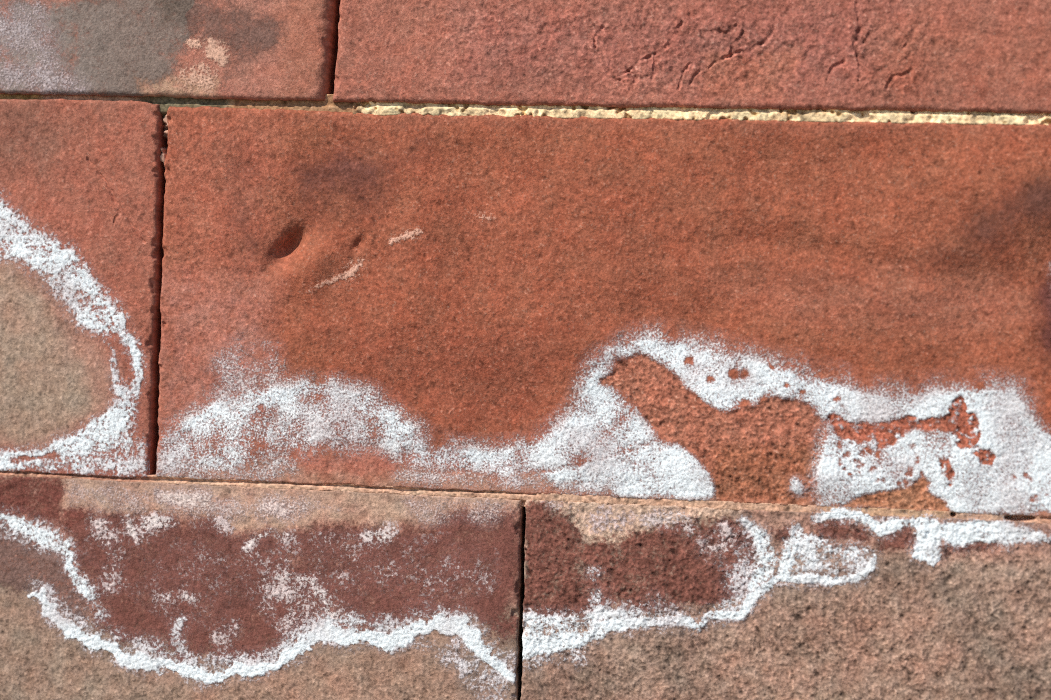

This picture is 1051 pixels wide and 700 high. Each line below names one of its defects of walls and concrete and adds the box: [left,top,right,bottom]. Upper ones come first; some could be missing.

water stain [0,0,280,96]
crack [592,24,605,50]
crack [609,19,776,91]
crack [825,1,916,91]
water stain [0,192,1051,700]